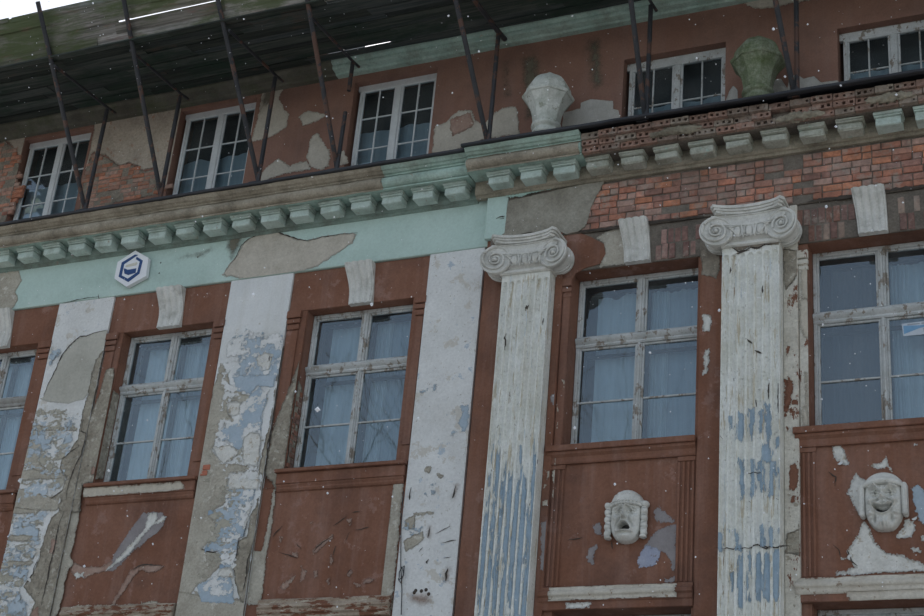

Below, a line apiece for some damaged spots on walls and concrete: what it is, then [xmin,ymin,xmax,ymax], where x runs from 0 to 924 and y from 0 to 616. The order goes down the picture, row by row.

flaking render [0,89,384,248]
flaking render [222,232,356,279]
flaking render [562,99,620,127]
flaking render [502,137,924,339]
flaking render [773,75,838,93]
flaking render [0,330,184,616]
peeling [175,329,303,616]
peeling [476,425,556,616]
peeling [548,506,677,609]
crack [716,543,791,551]
peeling [718,524,800,609]
peeling [794,446,924,601]